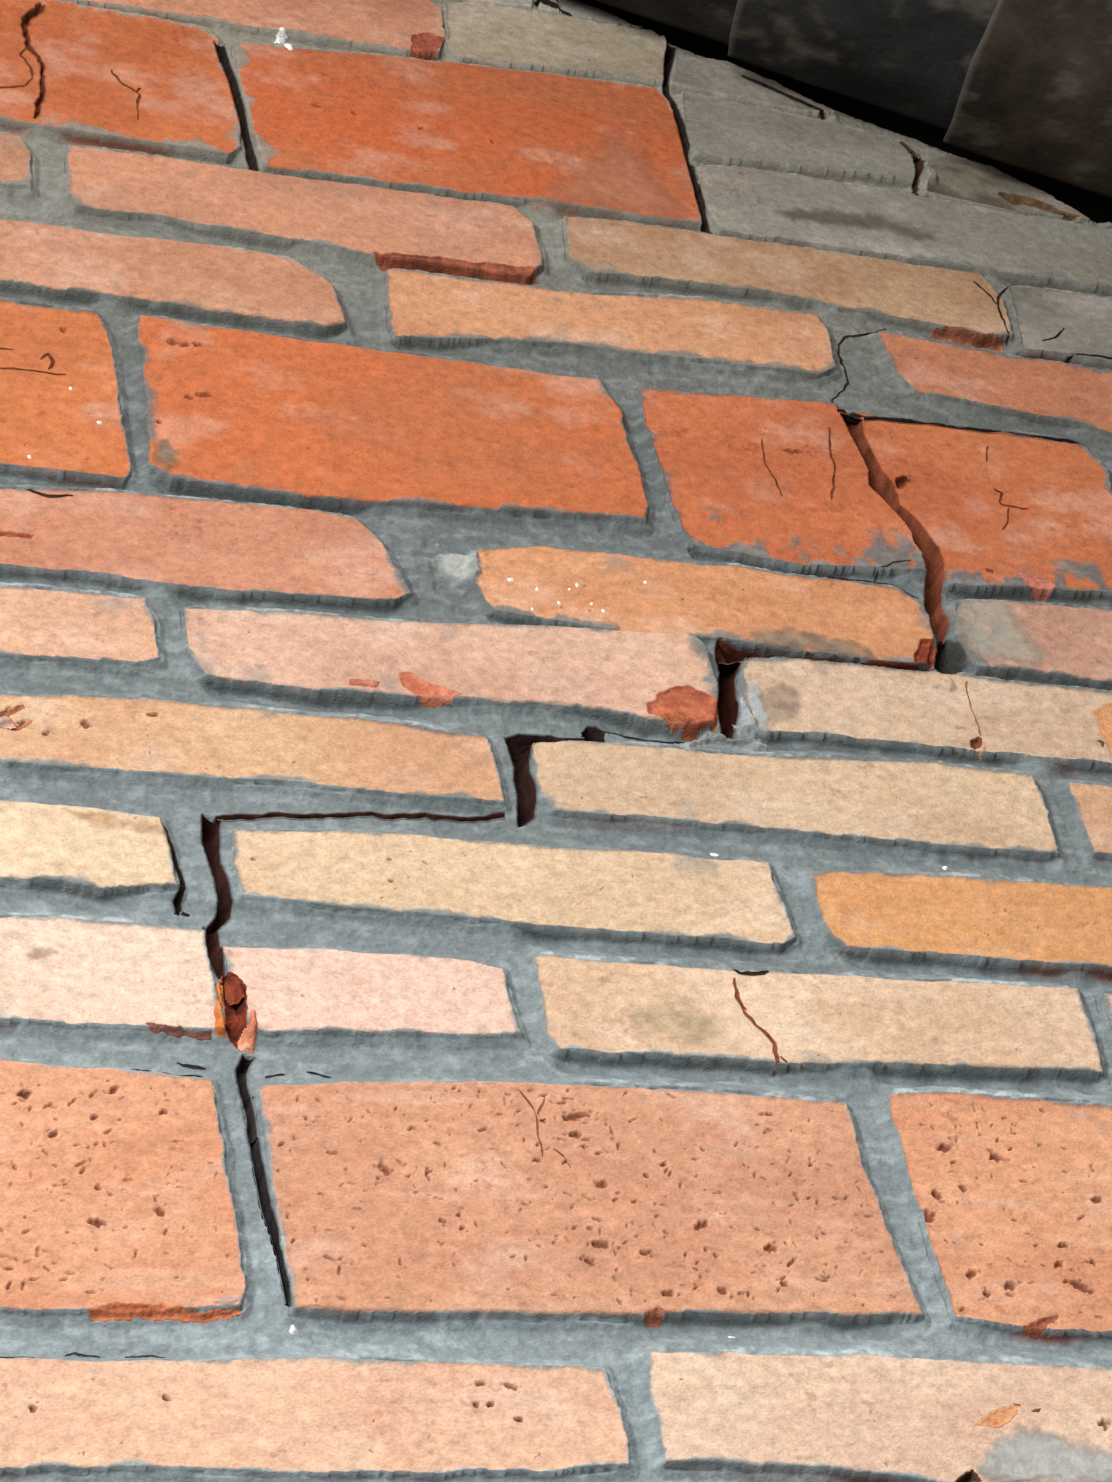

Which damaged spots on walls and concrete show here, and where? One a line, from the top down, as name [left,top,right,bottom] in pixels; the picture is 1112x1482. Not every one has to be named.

crack [0,2,47,119]
crack [213,40,260,171]
crack [661,41,713,234]
crack [714,328,1085,738]
spalling [646,685,768,752]
crack [161,725,685,979]
spalling [145,971,258,1056]
crack [733,969,789,1076]
crack [132,1054,331,1307]
crack [518,1089,571,1168]
crack [0,1351,166,1359]
spalling [956,1469,982,1482]